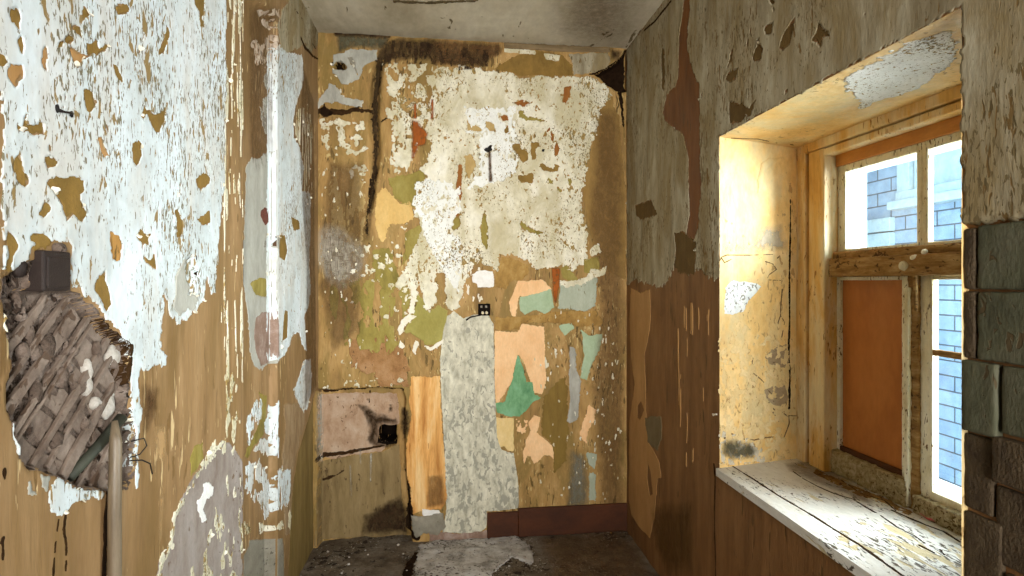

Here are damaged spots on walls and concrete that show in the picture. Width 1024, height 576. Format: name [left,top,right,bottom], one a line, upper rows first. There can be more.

damp [433,41,501,64]
crack [318,58,387,244]
peeling [0,0,407,576]
damp [320,235,353,279]
peeling [318,0,1024,576]
crack [718,199,797,441]
damp [724,442,754,458]